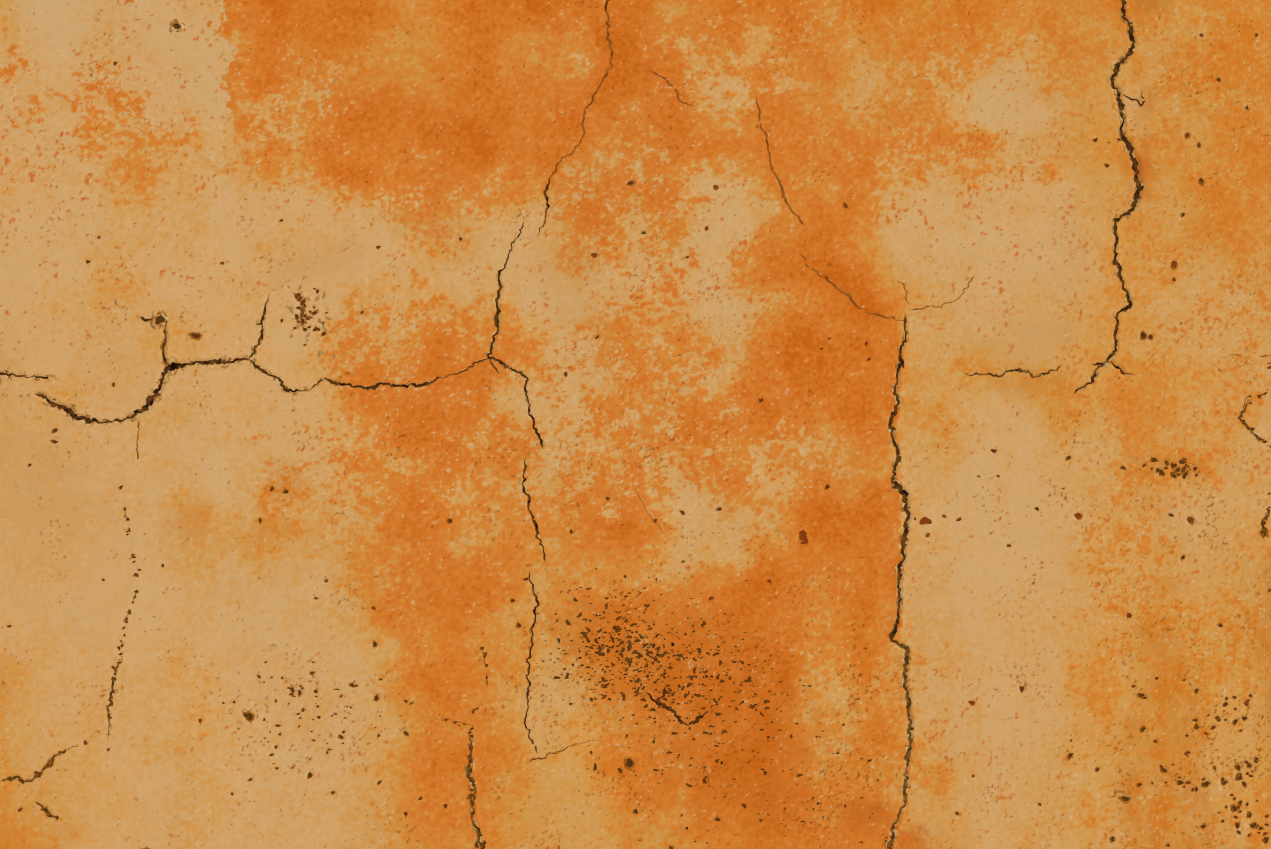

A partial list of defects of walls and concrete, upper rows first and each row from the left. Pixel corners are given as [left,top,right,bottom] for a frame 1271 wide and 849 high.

crack [652,71,694,107]
crack [756,101,804,225]
crack [964,0,1146,393]
crack [0,0,614,763]
crack [802,255,975,849]
rust [914,515,962,537]
crack [0,746,77,820]
crack [444,646,488,849]
rust [828,786,959,849]